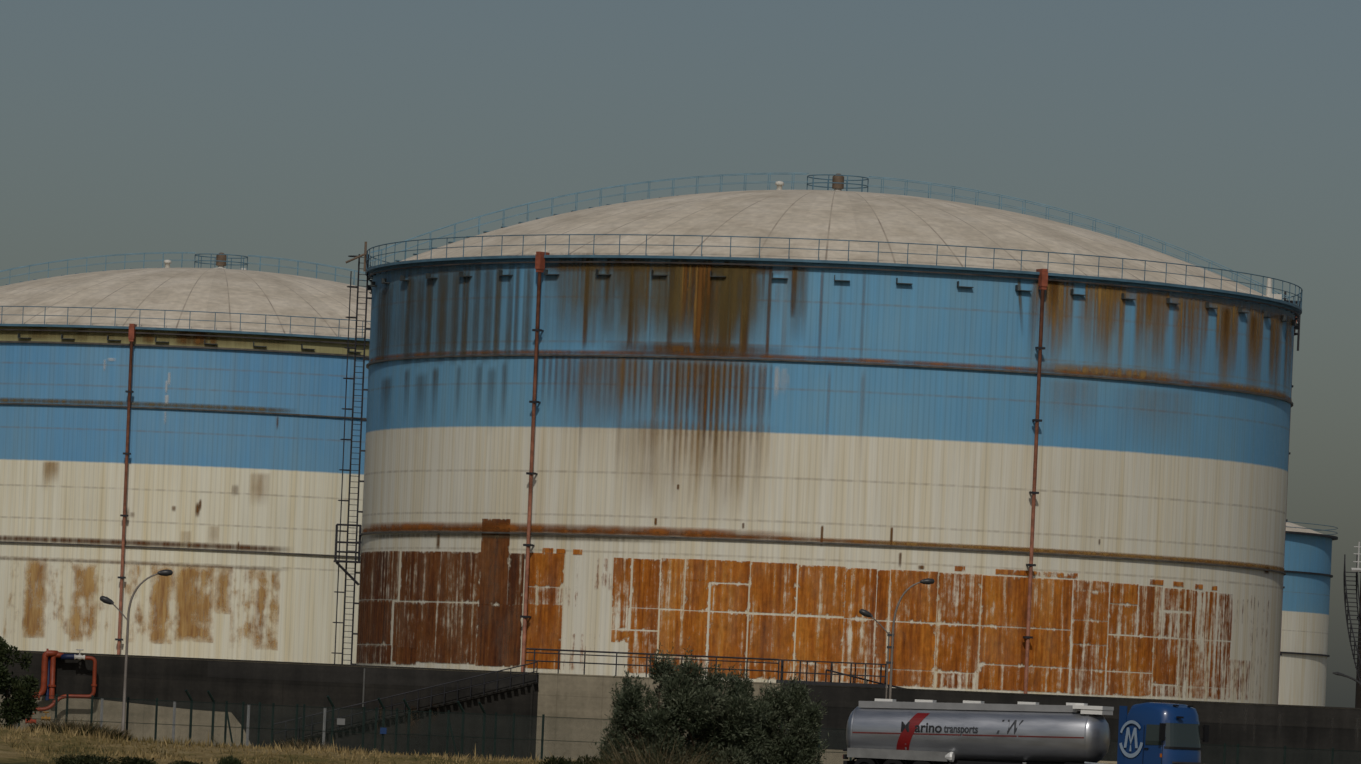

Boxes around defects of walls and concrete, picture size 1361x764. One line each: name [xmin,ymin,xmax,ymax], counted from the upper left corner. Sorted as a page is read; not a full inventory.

corrosion [370,258,805,425]
corrosion [914,362,1035,371]
corrosion [1086,284,1194,336]
corrosion [1057,366,1292,401]
corrosion [1213,302,1292,357]
corrosion [356,518,1283,699]